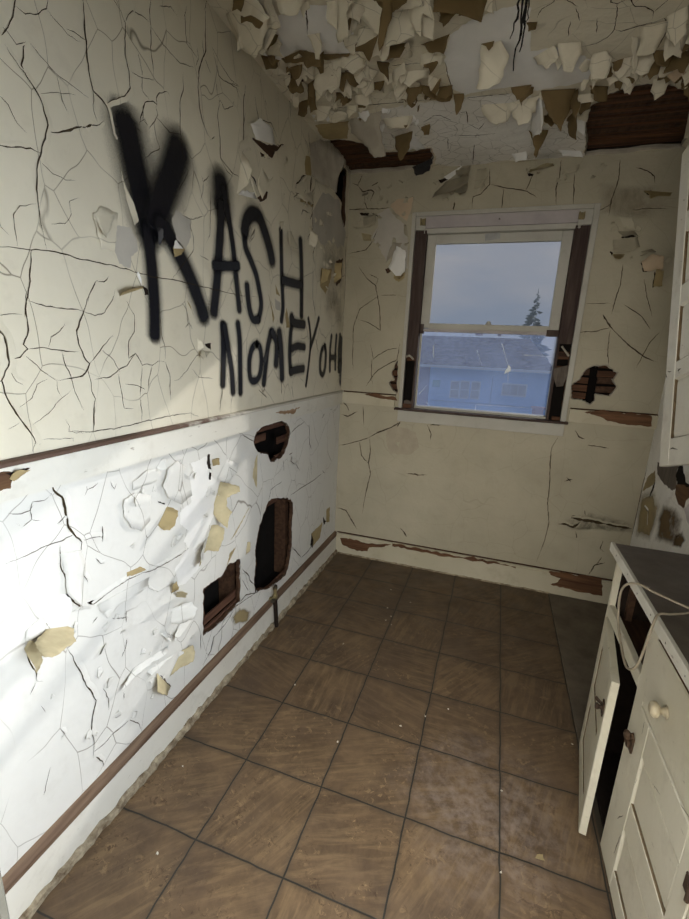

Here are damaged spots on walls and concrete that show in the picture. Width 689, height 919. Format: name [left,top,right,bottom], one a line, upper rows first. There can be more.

crack [537,0,668,50]
peeling [215,0,689,294]
crack [0,0,291,453]
crack [294,175,315,263]
crack [580,266,681,378]
flaking render [561,364,652,427]
peeling [0,468,30,491]
flaking render [253,407,300,487]
crack [539,431,606,555]
flaking render [643,462,689,524]
peeling [24,454,293,699]
peeling [549,571,603,596]